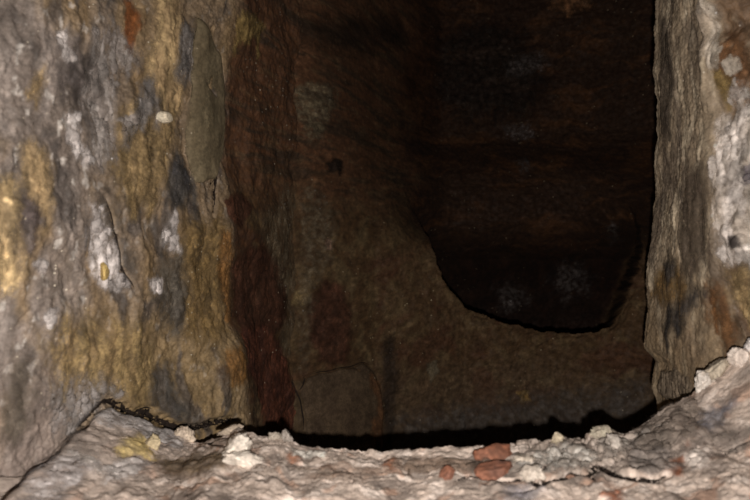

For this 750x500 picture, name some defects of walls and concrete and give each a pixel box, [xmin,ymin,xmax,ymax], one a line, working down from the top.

crack [106,200,135,290]
leakage [651,70,750,347]
crack [75,398,231,447]